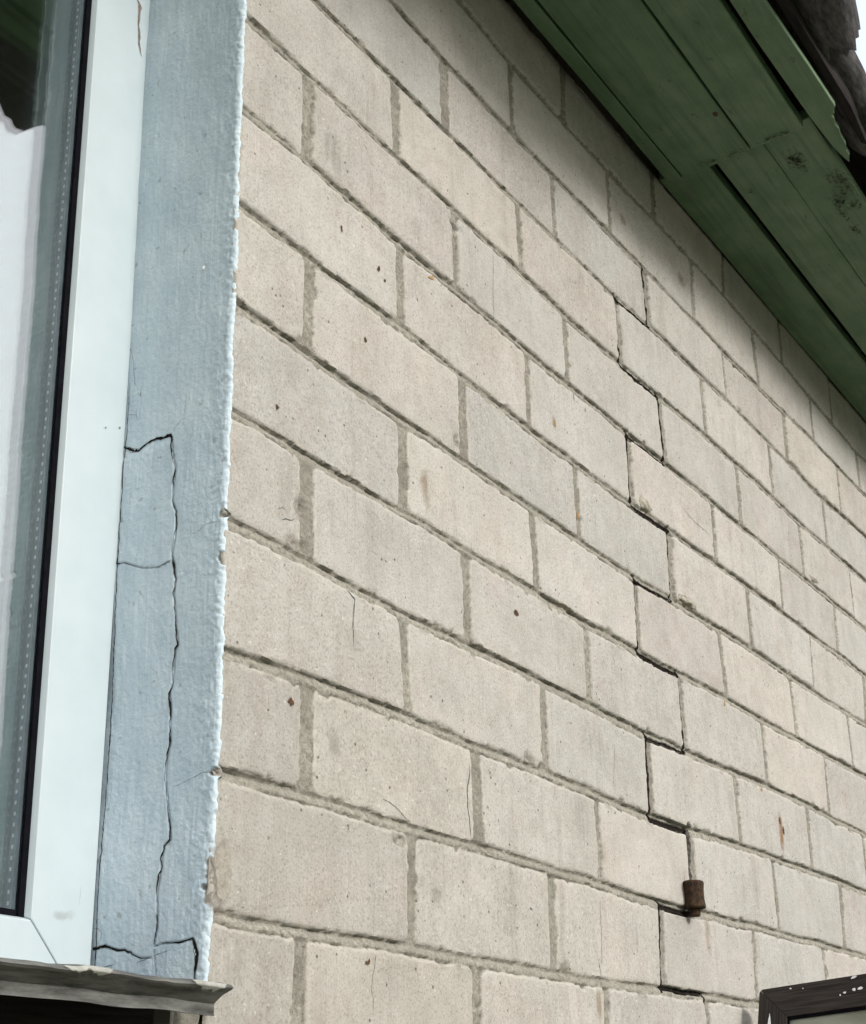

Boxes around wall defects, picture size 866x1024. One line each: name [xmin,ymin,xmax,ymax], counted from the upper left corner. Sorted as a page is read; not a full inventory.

crack [612,267,650,330]
crack [93,349,217,980]
crack [617,341,708,880]
crack [657,902,705,1003]